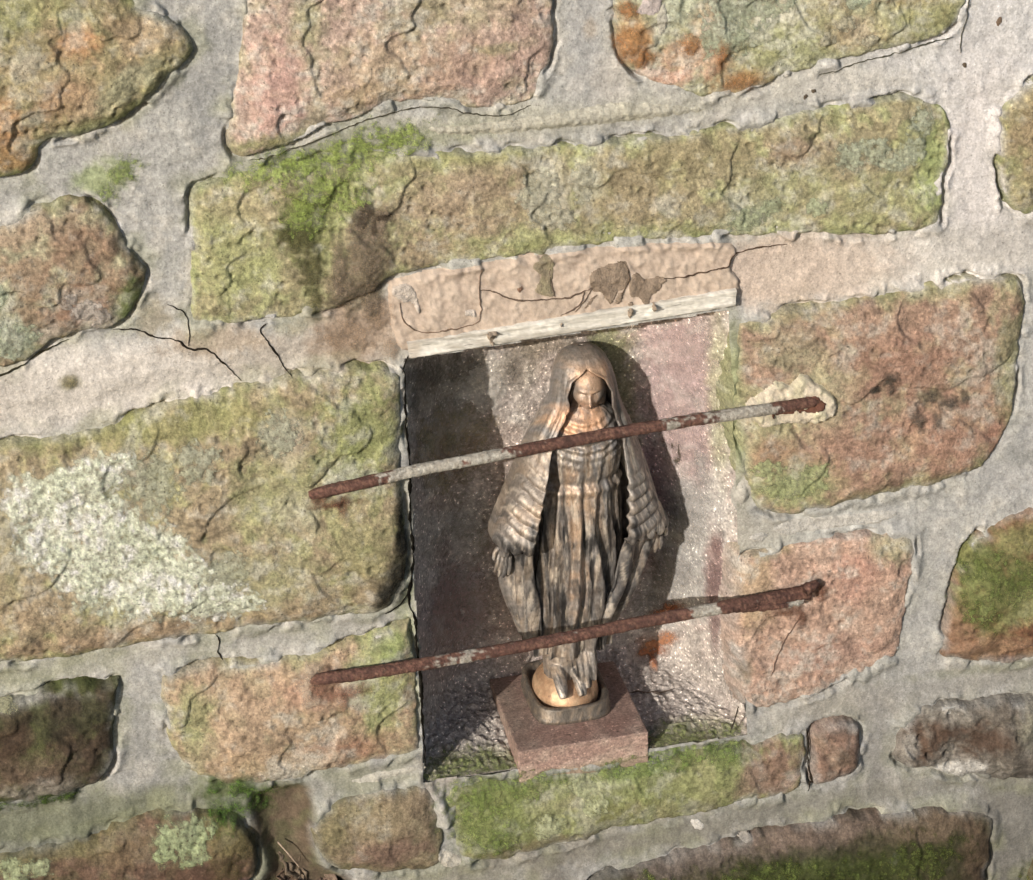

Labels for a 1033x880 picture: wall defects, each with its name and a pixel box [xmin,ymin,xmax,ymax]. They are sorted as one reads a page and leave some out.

crack [819,0,969,75]
damp [276,206,392,351]
crack [400,260,593,333]
flaking render [585,261,667,318]
crack [664,244,787,279]
crack [0,339,69,376]
crack [113,304,240,379]
crack [260,324,292,376]
damp [376,498,408,609]
crack [385,355,426,770]
rust [638,632,674,667]